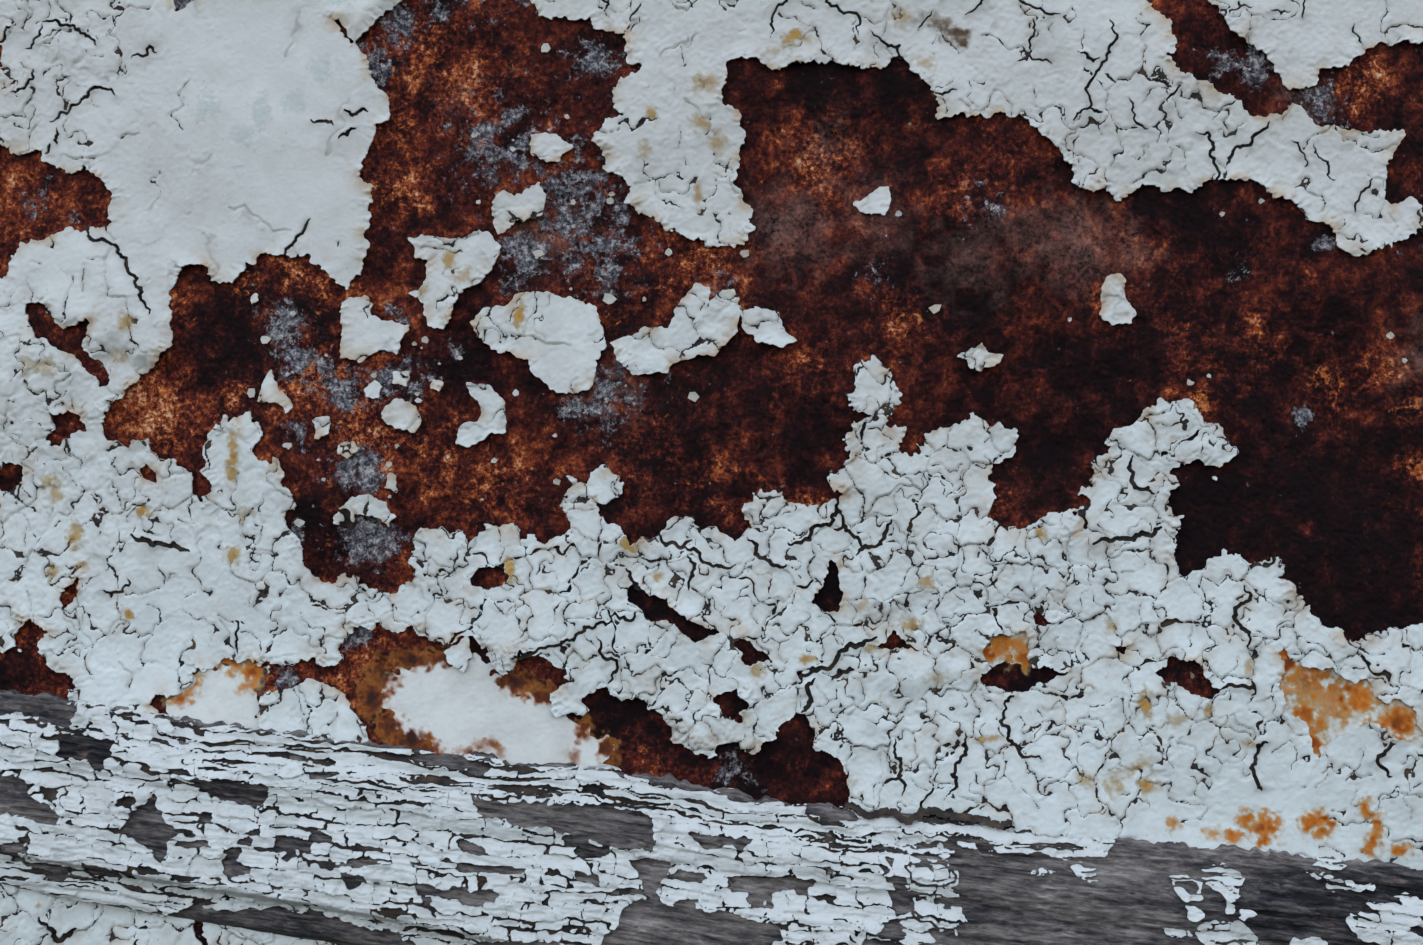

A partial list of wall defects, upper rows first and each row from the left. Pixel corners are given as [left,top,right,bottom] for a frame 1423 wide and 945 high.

crack [0,0,156,169]
crack [598,0,751,247]
crack [769,0,1423,252]
peeling [0,144,112,279]
peeling [26,0,1423,643]
corrosion [357,651,449,755]
peeling [150,622,856,813]
corrosion [495,673,556,704]
crack [0,225,1423,945]
corrosion [982,634,1031,674]
corrosion [1278,648,1423,758]
peeling [860,832,1423,945]